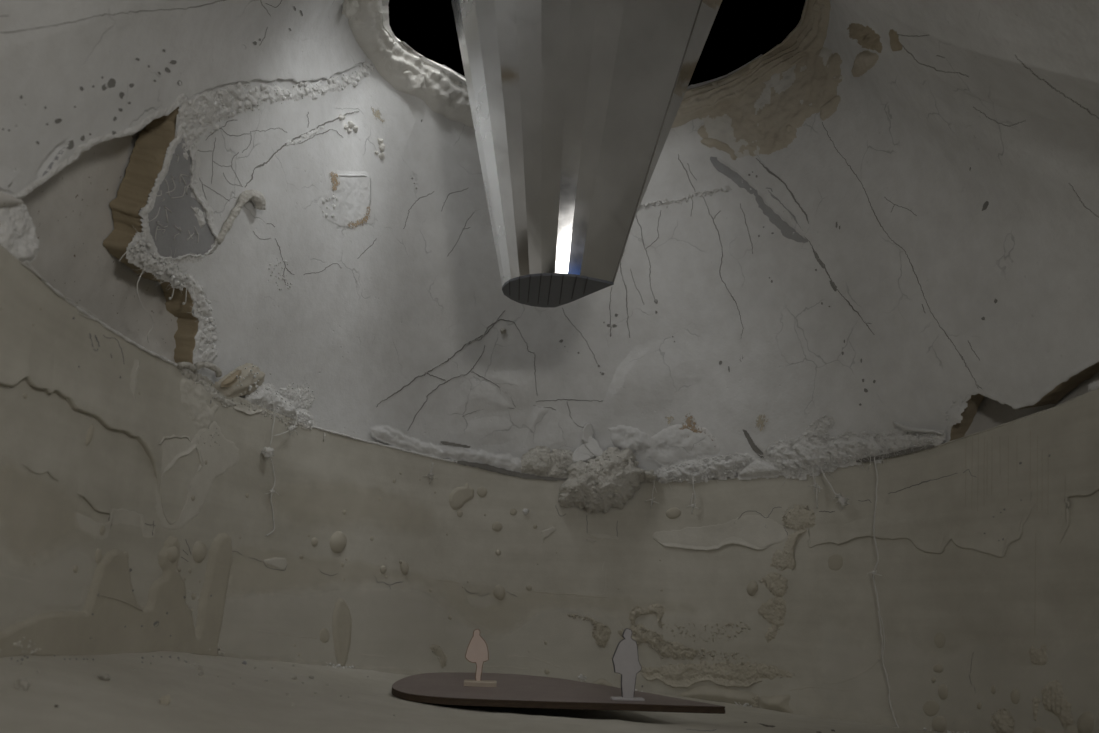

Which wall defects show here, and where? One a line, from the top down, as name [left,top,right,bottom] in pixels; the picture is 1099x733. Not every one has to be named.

peeling [134,27,375,265]
crack [252,223,377,284]
crack [403,187,474,256]
crack [562,210,662,365]
crack [678,154,754,362]
spalling [233,383,316,427]
spalling [370,424,523,473]
crack [376,310,603,431]
spalling [644,394,971,491]
spalling [567,604,750,661]